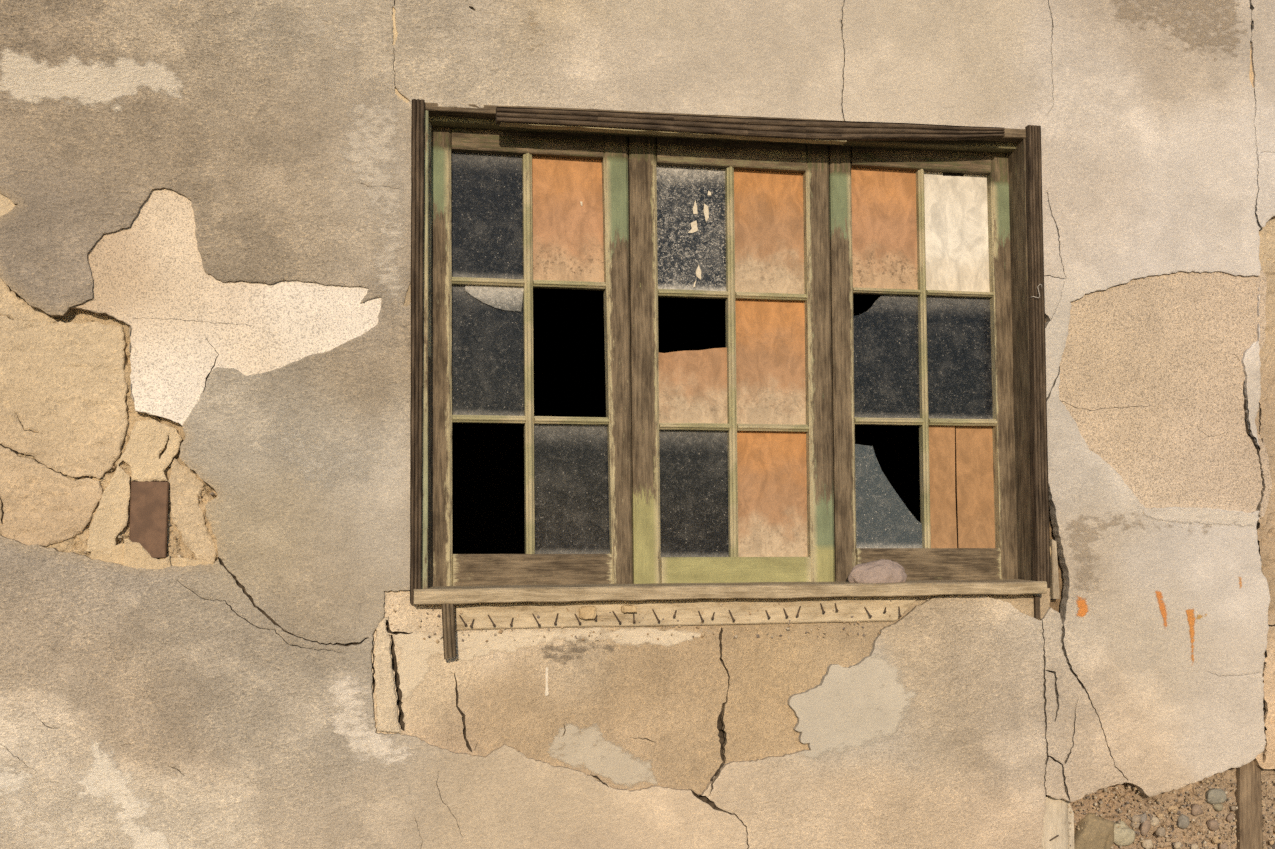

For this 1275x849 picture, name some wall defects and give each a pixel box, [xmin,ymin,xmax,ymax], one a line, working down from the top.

spalling [0,188,381,569]
spalling [987,507,1064,620]
spalling [1047,216,1275,849]
spalling [371,590,947,794]
crack [689,630,749,848]
crack [1040,619,1127,800]